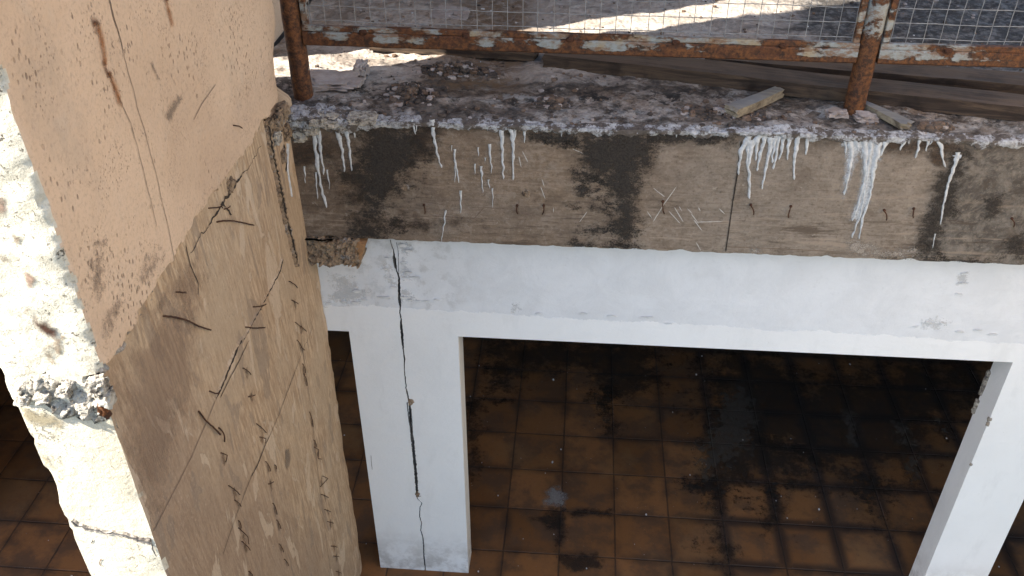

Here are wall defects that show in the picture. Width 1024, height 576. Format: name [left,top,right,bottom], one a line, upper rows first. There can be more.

corrosion [93,20,121,104]
crack [71,1,300,567]
spalling [266,100,293,164]
spalling [305,235,368,269]
damp [286,102,1024,263]
spalling [13,309,118,428]
crack [223,316,339,571]
crack [390,240,426,568]